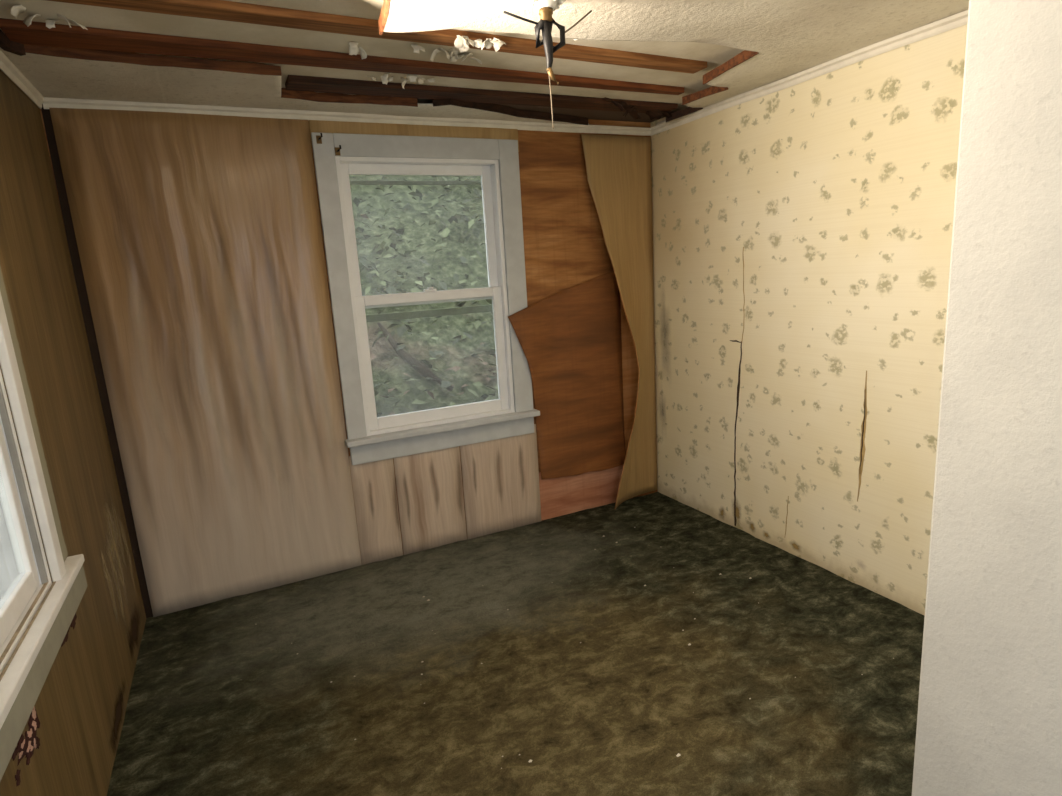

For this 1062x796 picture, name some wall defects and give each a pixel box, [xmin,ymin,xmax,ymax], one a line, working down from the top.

peeling [10,5,88,30]
peeling [349,42,367,59]
peeling [368,73,435,89]
peeling [411,35,506,65]
peeling [581,134,658,509]
crack [730,247,745,526]
crack [857,371,867,502]
peeling [11,707,40,786]